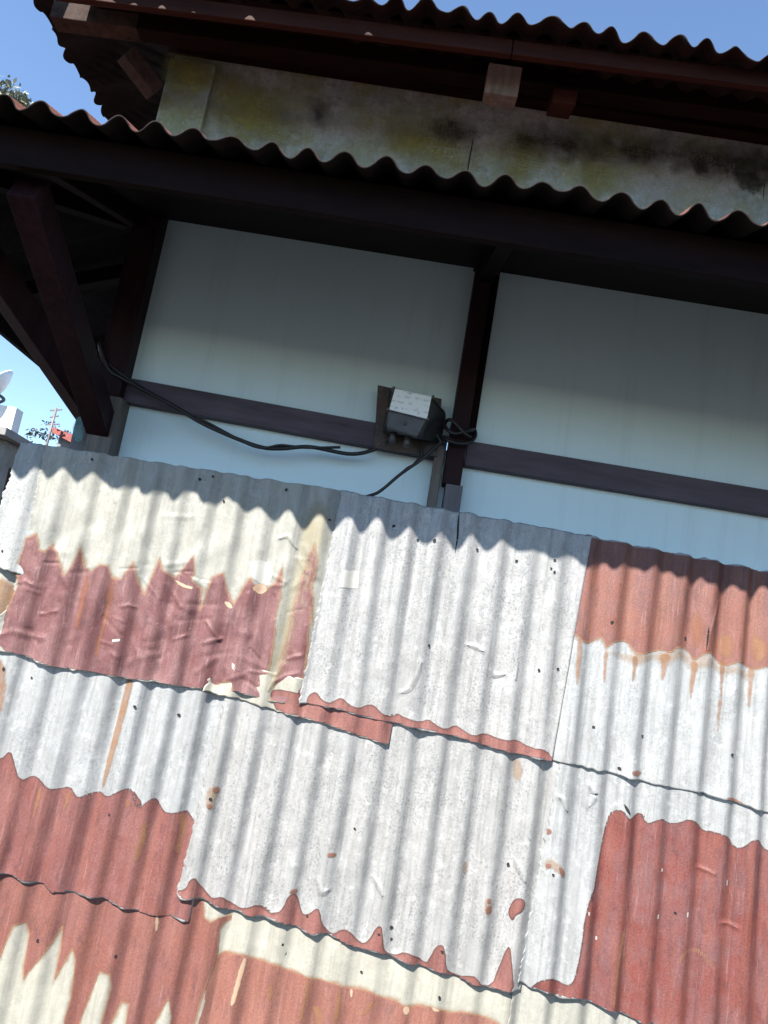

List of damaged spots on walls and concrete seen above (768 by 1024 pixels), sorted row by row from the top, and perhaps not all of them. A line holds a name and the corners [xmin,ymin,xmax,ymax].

leakage [519,133,768,194]
corrosion [104,679,132,777]
peeling [0,533,552,761]
peeling [0,752,514,1024]
peeling [531,810,768,1024]